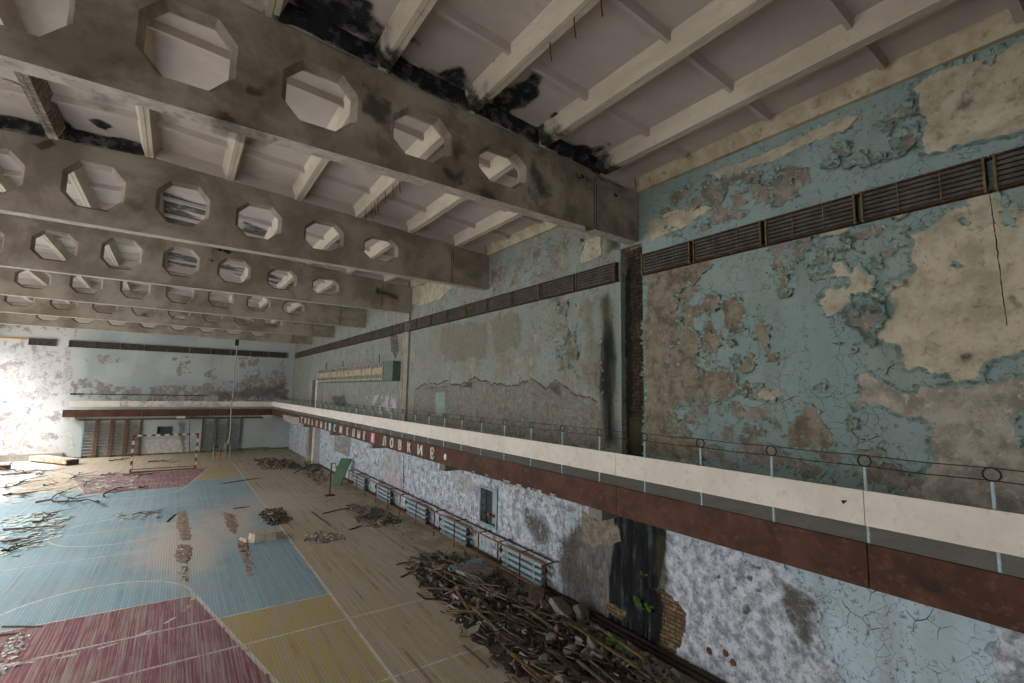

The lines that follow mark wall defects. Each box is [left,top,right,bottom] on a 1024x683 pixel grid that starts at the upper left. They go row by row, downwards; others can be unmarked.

leakage [273,0,621,175]
peeling [642,35,1024,241]
crack [988,182,1008,326]
peeling [145,439,189,454]
peeling [70,356,292,402]
peeling [283,414,299,424]
leakage [412,296,614,451]
peeling [640,185,1024,514]
peeling [649,533,842,683]
crack [841,588,962,648]